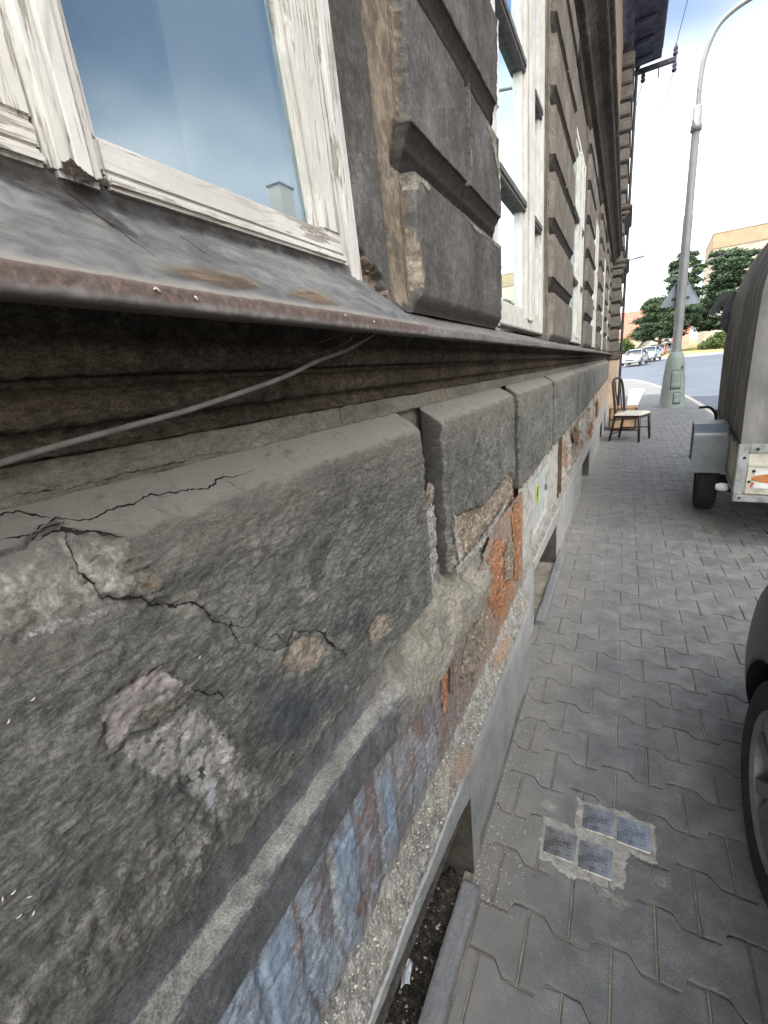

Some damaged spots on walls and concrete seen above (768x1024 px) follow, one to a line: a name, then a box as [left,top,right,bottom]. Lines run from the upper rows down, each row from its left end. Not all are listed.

corrosion [176,269,256,289]
crack [0,447,346,656]
peeling [426,482,438,583]
spalling [451,474,515,574]
spalling [282,635,325,673]
spalling [368,613,389,642]
spalling [0,665,261,1024]